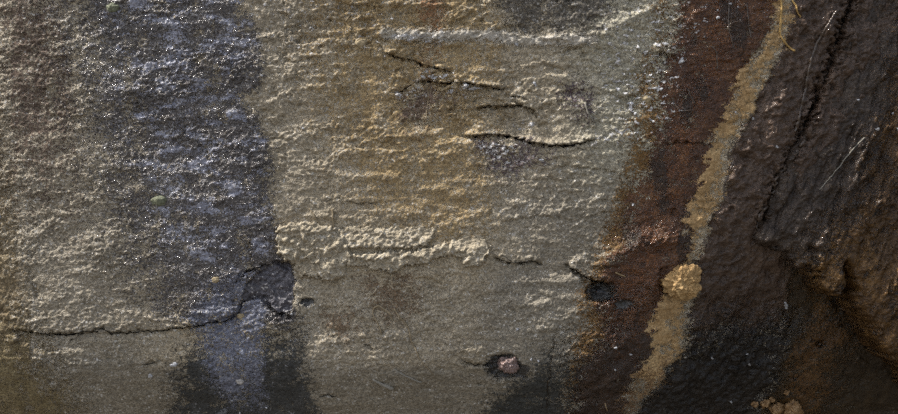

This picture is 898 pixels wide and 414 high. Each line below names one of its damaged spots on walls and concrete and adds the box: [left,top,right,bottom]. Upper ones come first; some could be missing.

crack [384,52,537,118]
crack [460,133,593,150]
leakage [0,0,708,414]
crack [13,264,290,345]
peeling [241,221,492,316]